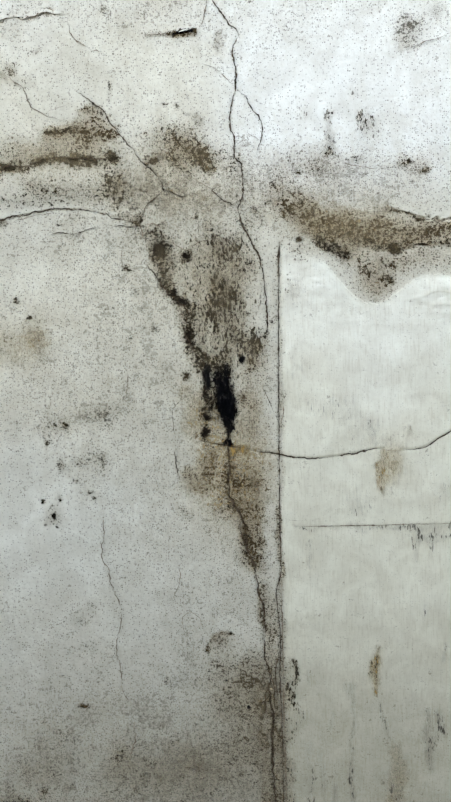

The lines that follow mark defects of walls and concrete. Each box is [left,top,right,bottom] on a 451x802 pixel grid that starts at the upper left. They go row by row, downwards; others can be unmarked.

crack [1,12,99,52]
spalling [147,26,197,42]
crack [0,71,66,118]
damp [0,81,128,182]
crack [0,91,189,240]
damp [138,101,240,184]
damp [260,107,451,302]
crack [146,265,196,355]
crack [198,0,451,802]
mould [57,453,110,482]
damp [135,224,304,802]
crack [101,520,137,758]